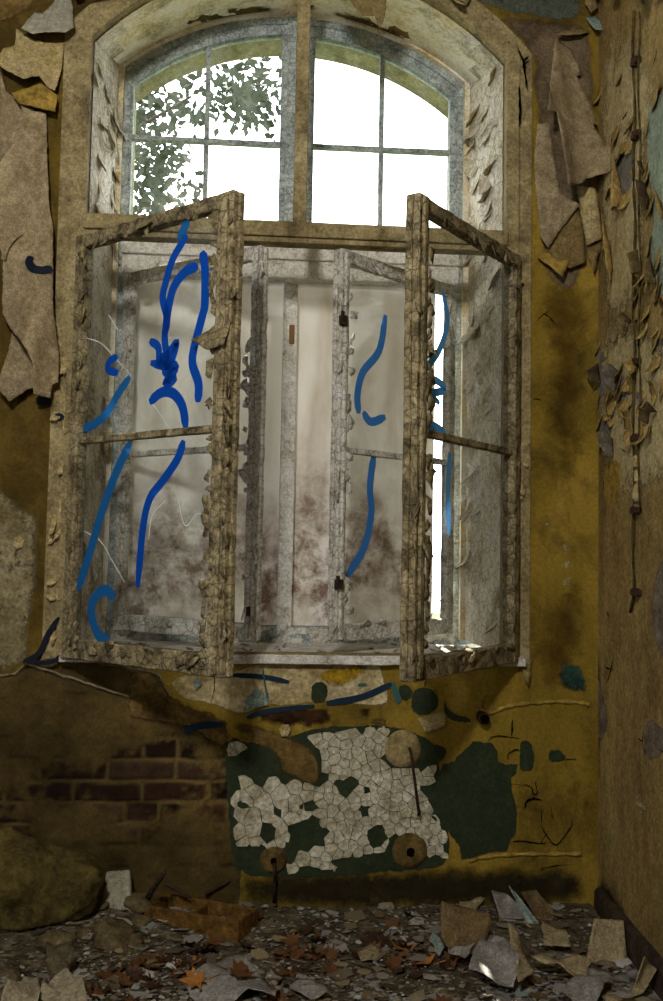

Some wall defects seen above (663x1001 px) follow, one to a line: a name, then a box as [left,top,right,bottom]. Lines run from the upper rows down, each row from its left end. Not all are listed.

flaking render [0,0,35,21]
peeling [78,218,153,266]
peeling [191,241,231,379]
peeling [414,200,441,429]
peeling [461,103,517,291]
peeling [585,83,663,505]
flaking render [0,333,534,904]
peeling [549,750,566,762]
leakage [245,868,579,906]